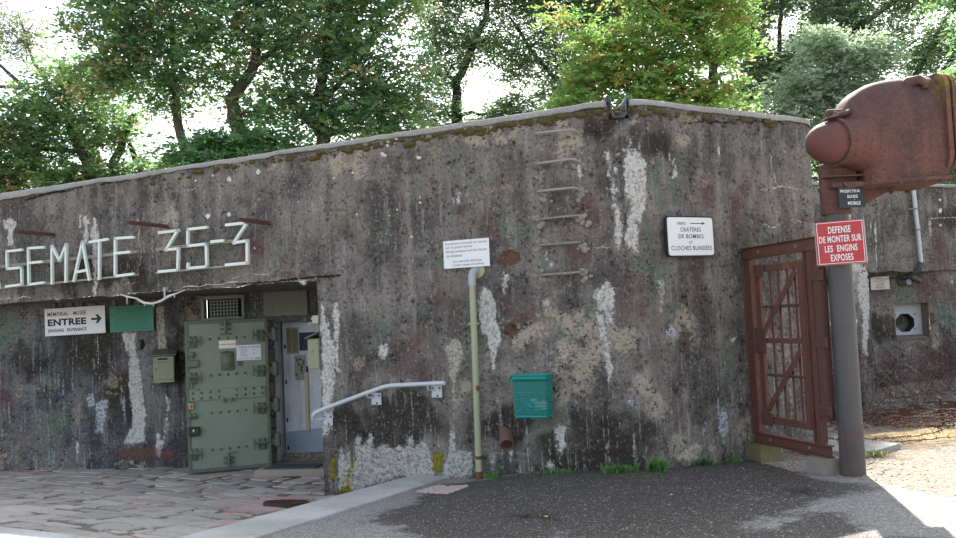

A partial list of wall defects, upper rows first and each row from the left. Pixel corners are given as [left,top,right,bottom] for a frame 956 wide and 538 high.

damp [120,281,238,349]
damp [86,394,110,433]
damp [122,331,170,456]